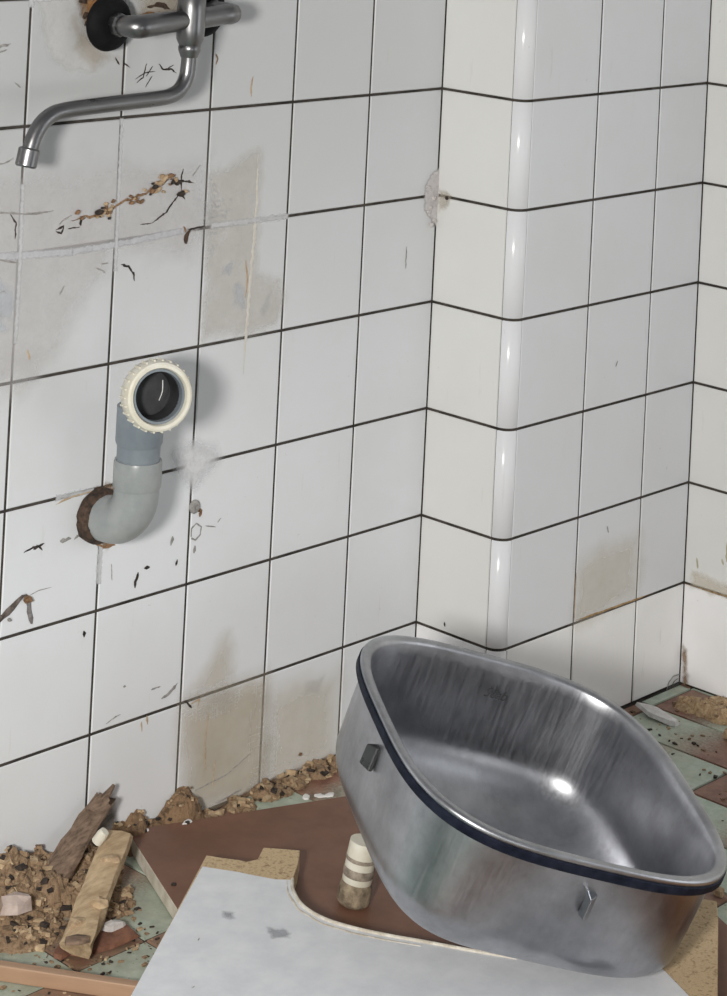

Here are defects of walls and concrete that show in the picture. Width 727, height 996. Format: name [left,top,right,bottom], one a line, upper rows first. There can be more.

spalling [425,169,448,227]